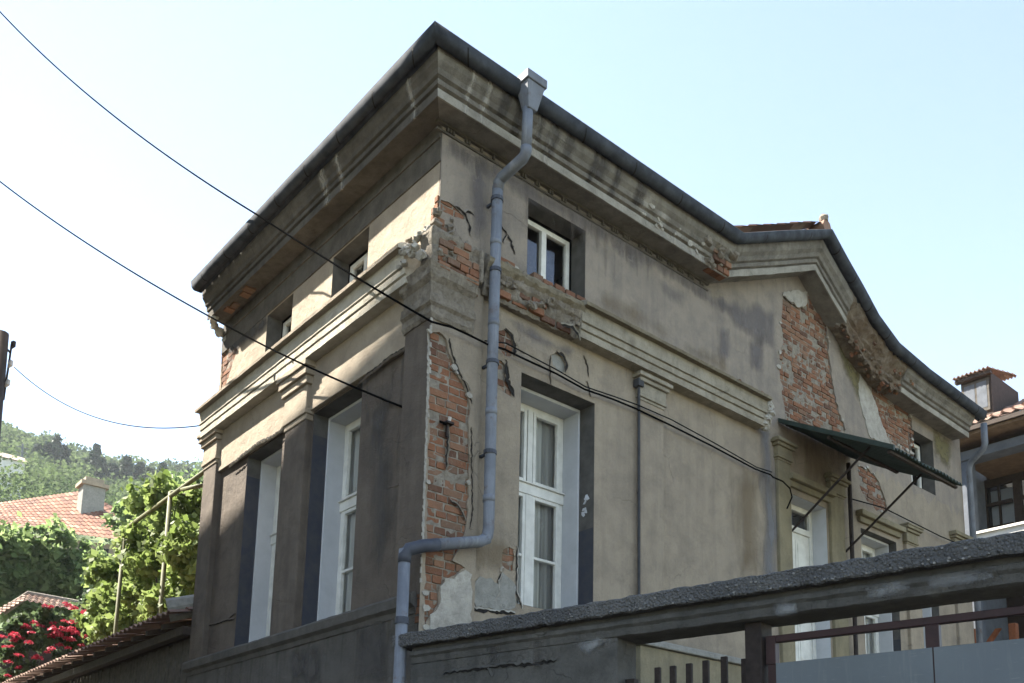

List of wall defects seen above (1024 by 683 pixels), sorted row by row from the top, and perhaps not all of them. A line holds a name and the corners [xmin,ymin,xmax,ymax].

spalling [396,195,479,297]
crack [454,205,475,236]
crack [502,225,516,255]
flaking render [639,197,732,281]
flaking render [219,348,238,388]
flaking render [497,330,513,396]
spalling [551,349,569,373]
crack [584,355,592,397]
flaking render [776,290,844,432]
flaking render [858,374,914,456]
flaking render [415,317,473,630]
flaking render [858,465,887,513]